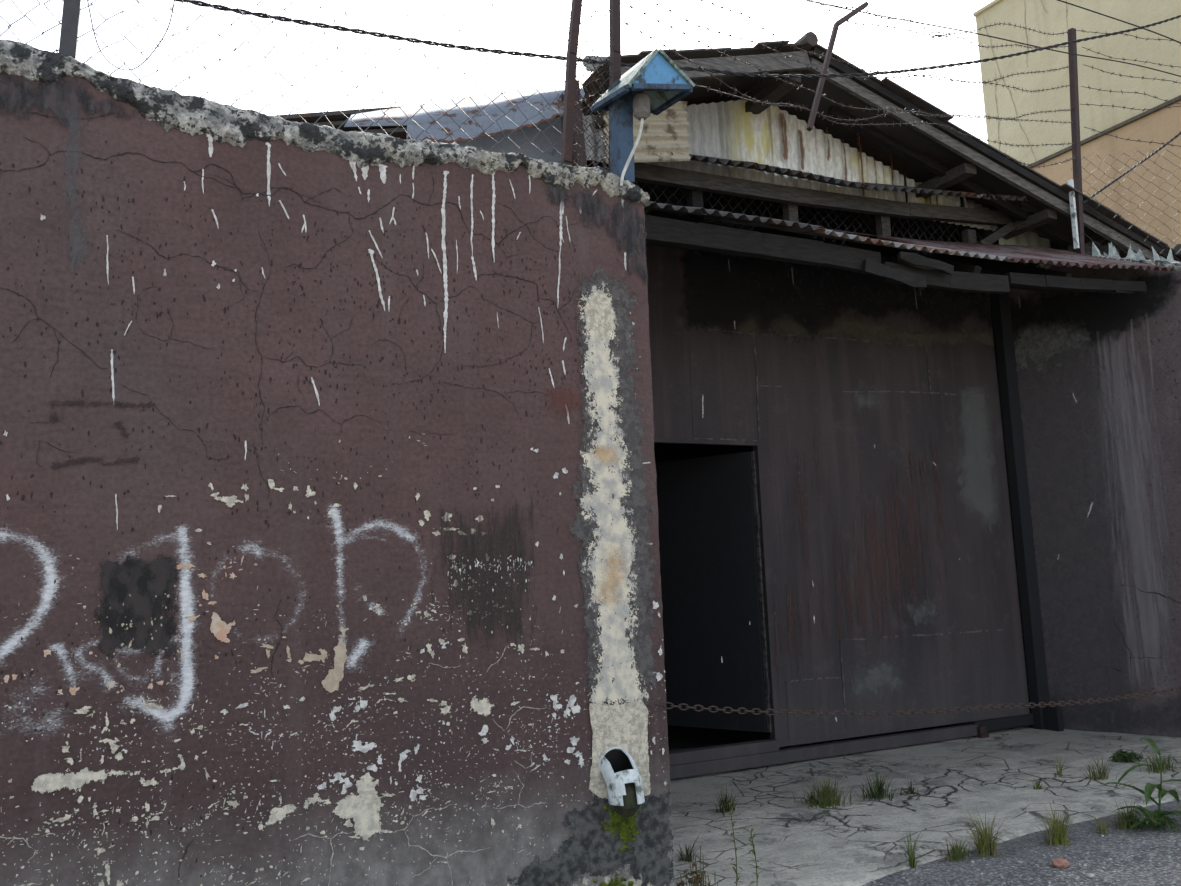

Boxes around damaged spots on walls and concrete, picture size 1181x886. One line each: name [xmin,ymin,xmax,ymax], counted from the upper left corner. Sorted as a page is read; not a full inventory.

crack [0,107,579,500]
corrosion [407,113,563,143]
flaking render [3,268,665,886]
damp [1016,330,1181,734]
damp [507,791,674,886]